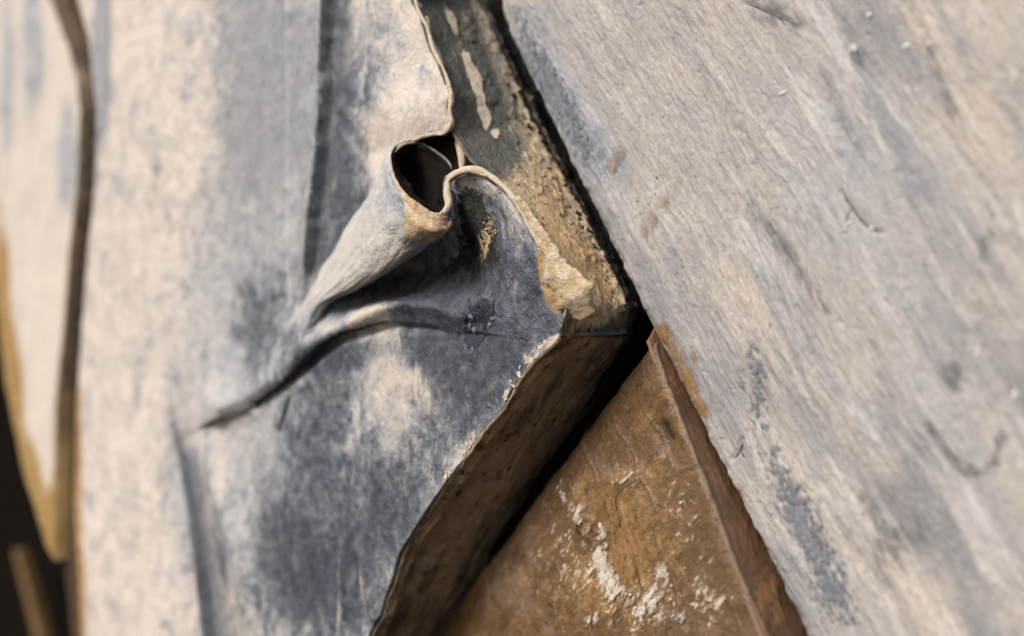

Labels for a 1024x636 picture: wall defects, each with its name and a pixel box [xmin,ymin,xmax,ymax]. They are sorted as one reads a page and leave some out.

peeling [444,7,458,36]
peeling [462,49,500,139]
peeling [507,82,627,317]
peeling [475,216,499,262]
peeling [347,304,387,325]
spalling [462,293,496,349]
peeling [378,357,430,411]
peeling [503,334,559,401]
corrosion [657,322,710,419]
peeling [443,430,476,481]
crack [574,480,643,594]